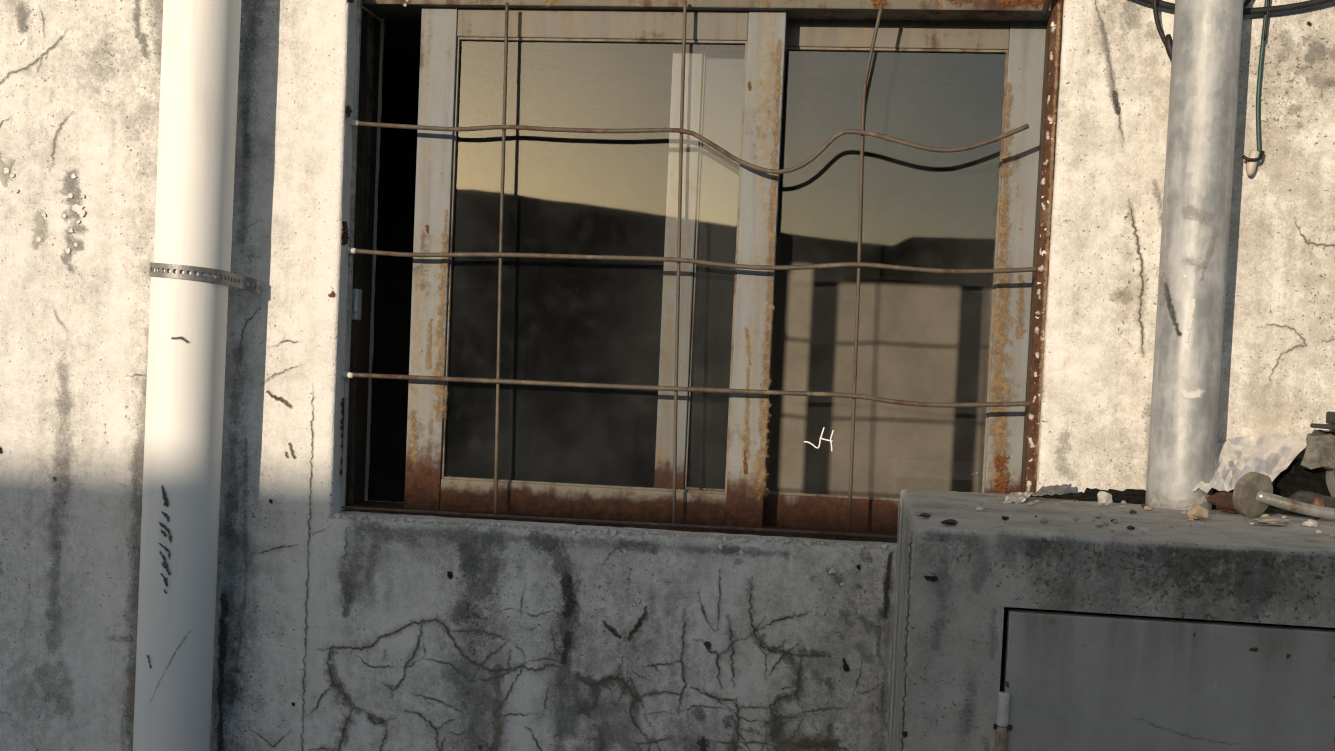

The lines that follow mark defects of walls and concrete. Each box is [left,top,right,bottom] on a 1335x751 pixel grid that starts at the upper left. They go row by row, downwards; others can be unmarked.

crack [0,12,65,83]
crack [1095,0,1123,138]
crack [1129,206,1144,354]
crack [1295,222,1335,247]
crack [1261,324,1335,381]
crack [252,397,913,751]